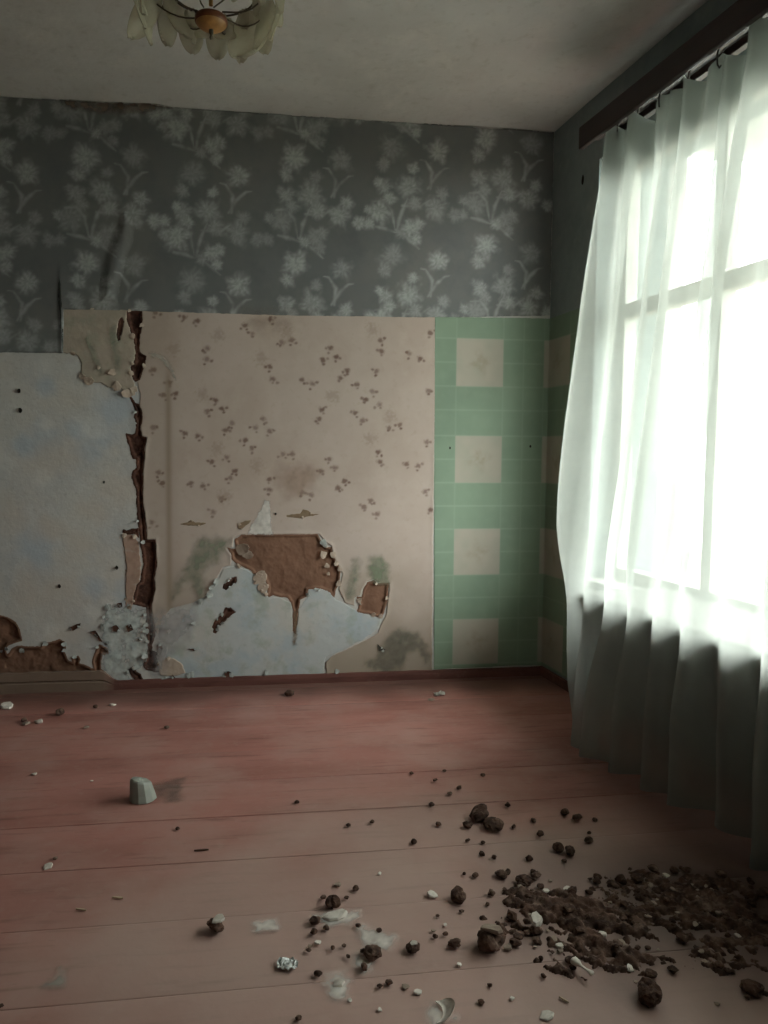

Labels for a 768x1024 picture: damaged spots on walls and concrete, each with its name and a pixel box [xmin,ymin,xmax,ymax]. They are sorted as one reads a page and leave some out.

crack [116,309,168,679]
peeling [0,523,389,680]
water stain [369,632,428,670]